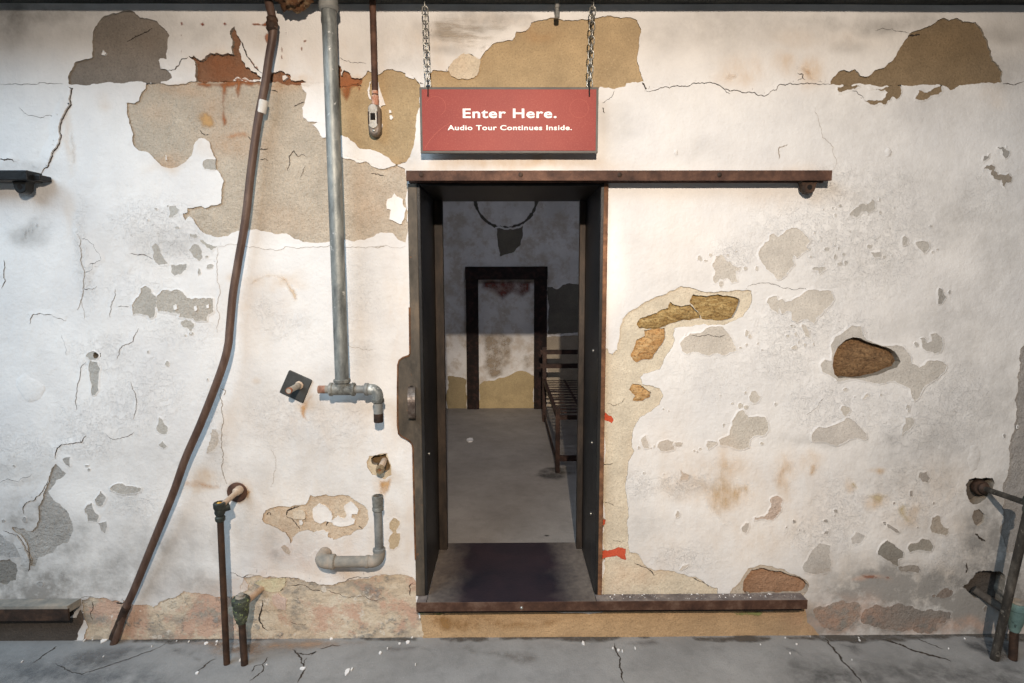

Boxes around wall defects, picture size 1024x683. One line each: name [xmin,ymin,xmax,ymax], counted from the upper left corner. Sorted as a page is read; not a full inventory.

crack [0,82,73,174]
peeling [64,6,330,337]
rust [198,79,259,93]
peeling [338,11,647,246]
crack [645,73,831,96]
peeling [826,14,1006,108]
peeling [0,224,1024,641]
crack [825,638,862,683]